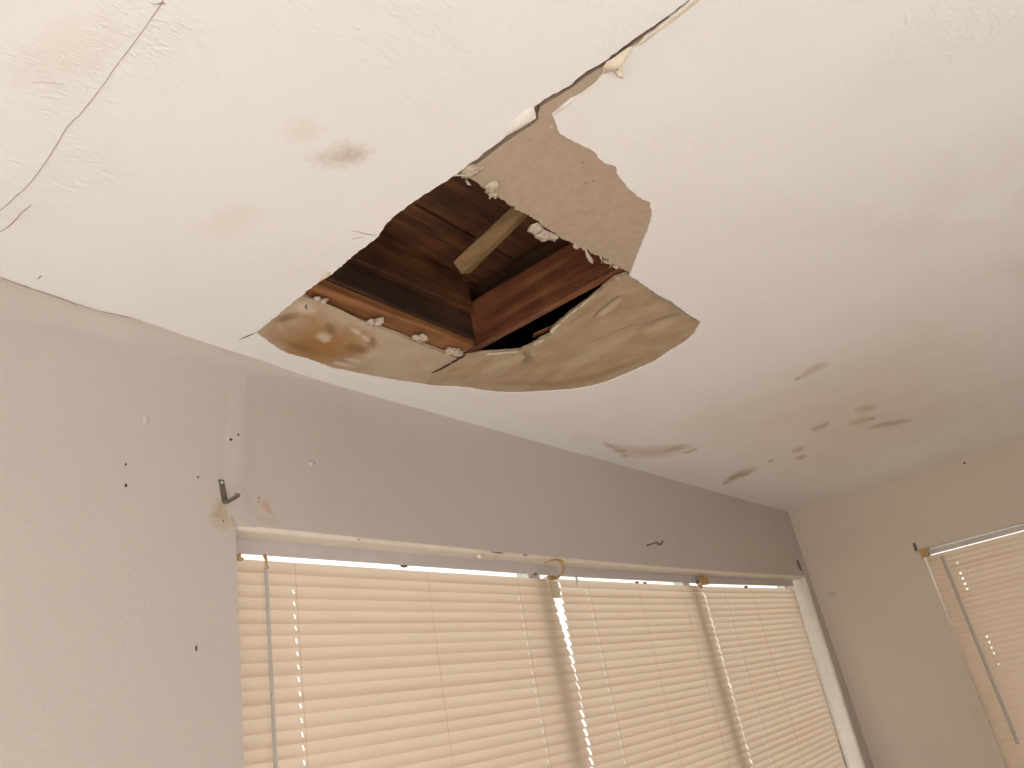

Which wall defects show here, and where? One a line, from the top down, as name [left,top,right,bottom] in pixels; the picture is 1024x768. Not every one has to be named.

crack [0,0,166,232]
leakage [268,107,390,175]
peeling [504,107,536,137]
peeling [553,0,700,116]
leakage [257,296,391,375]
leakage [560,253,1024,498]